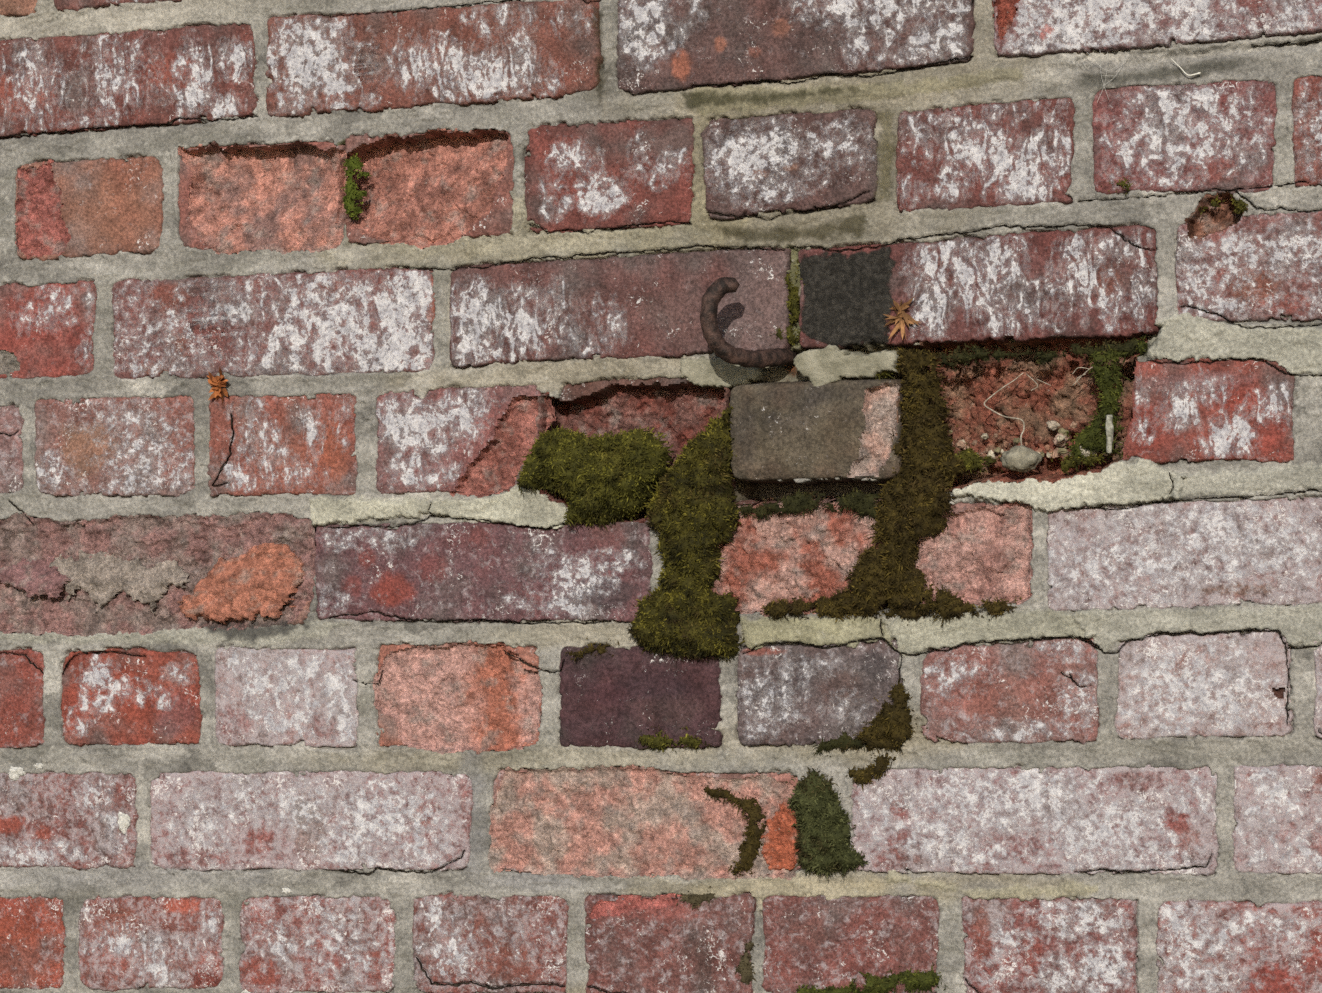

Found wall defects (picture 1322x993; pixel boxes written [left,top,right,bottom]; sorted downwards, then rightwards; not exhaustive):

damp [2,4,563,131]
damp [794,0,970,63]
damp [1008,0,1322,53]
damp [705,120,874,206]
damp [901,101,1071,202]
damp [1100,87,1272,189]
spalling [1185,191,1248,239]
crack [212,413,234,486]
spalling [447,380,730,498]
spalling [846,382,907,479]
spalling [907,337,1148,491]
spalling [0,511,316,637]